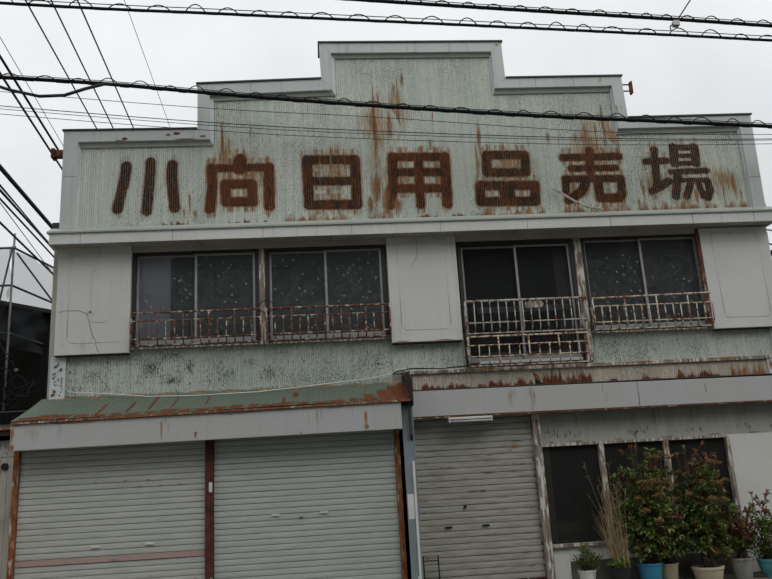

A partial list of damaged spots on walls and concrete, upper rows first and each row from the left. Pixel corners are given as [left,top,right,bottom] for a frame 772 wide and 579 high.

corrosion [287,75,464,221]
corrosion [474,123,545,215]
corrosion [559,106,747,213]
corrosion [9,382,411,451]
corrosion [422,370,592,397]
corrosion [677,370,720,379]
corrosion [717,357,771,377]